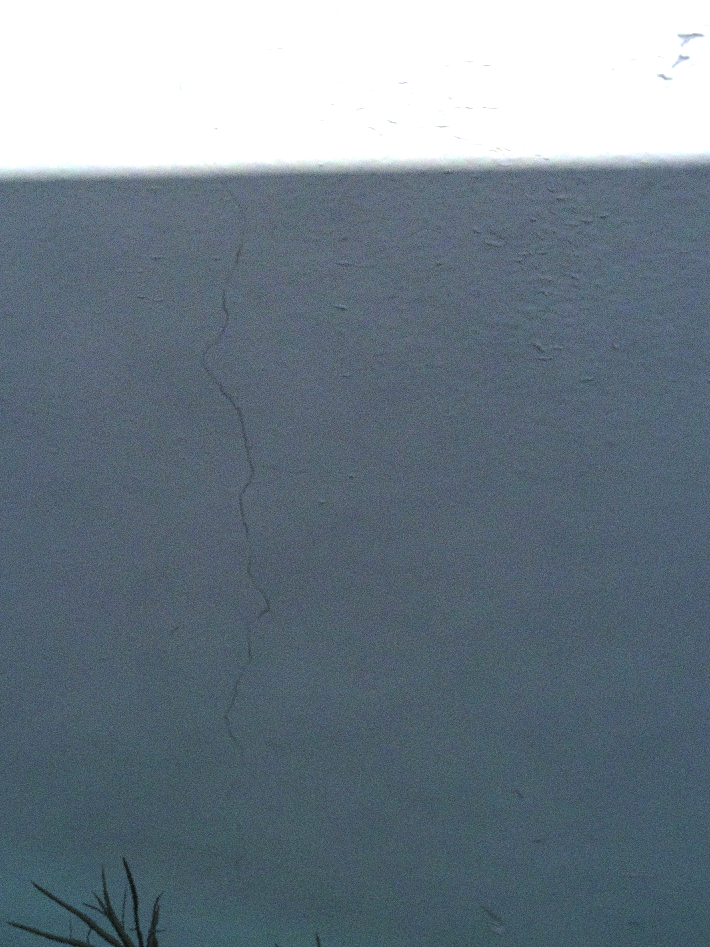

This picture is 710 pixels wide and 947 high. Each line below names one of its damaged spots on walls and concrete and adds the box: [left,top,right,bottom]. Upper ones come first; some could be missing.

crack [166,0,332,880]
spalling [654,27,710,87]